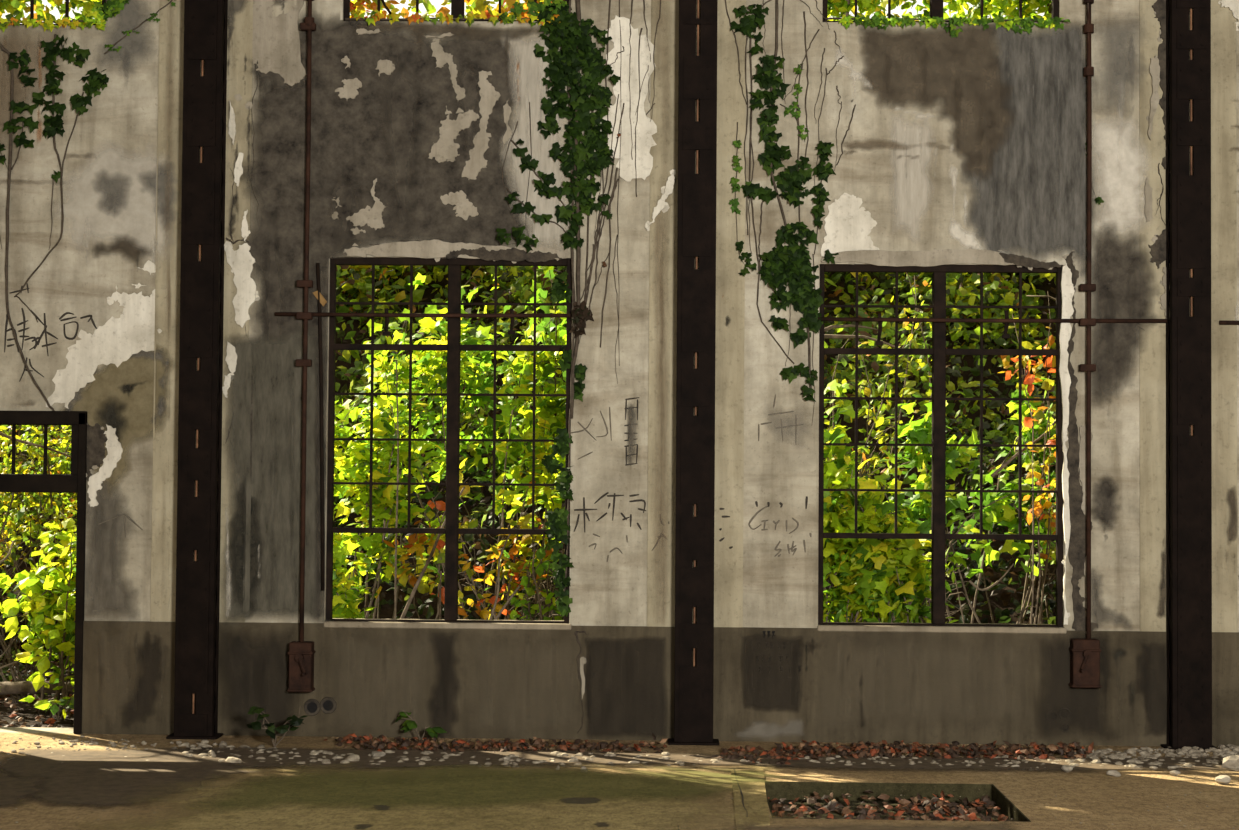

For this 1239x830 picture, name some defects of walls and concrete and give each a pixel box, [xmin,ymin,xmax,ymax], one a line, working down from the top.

peeling [252,0,307,86]
peeling [335,56,362,99]
peeling [376,59,395,76]
peeling [227,79,252,187]
peeling [425,32,513,220]
peeling [332,178,385,258]
spalling [446,247,562,264]
peeling [645,169,676,231]
damp [837,22,1152,402]
peeling [46,260,162,408]
peeling [86,422,123,507]
damp [1094,479,1117,527]